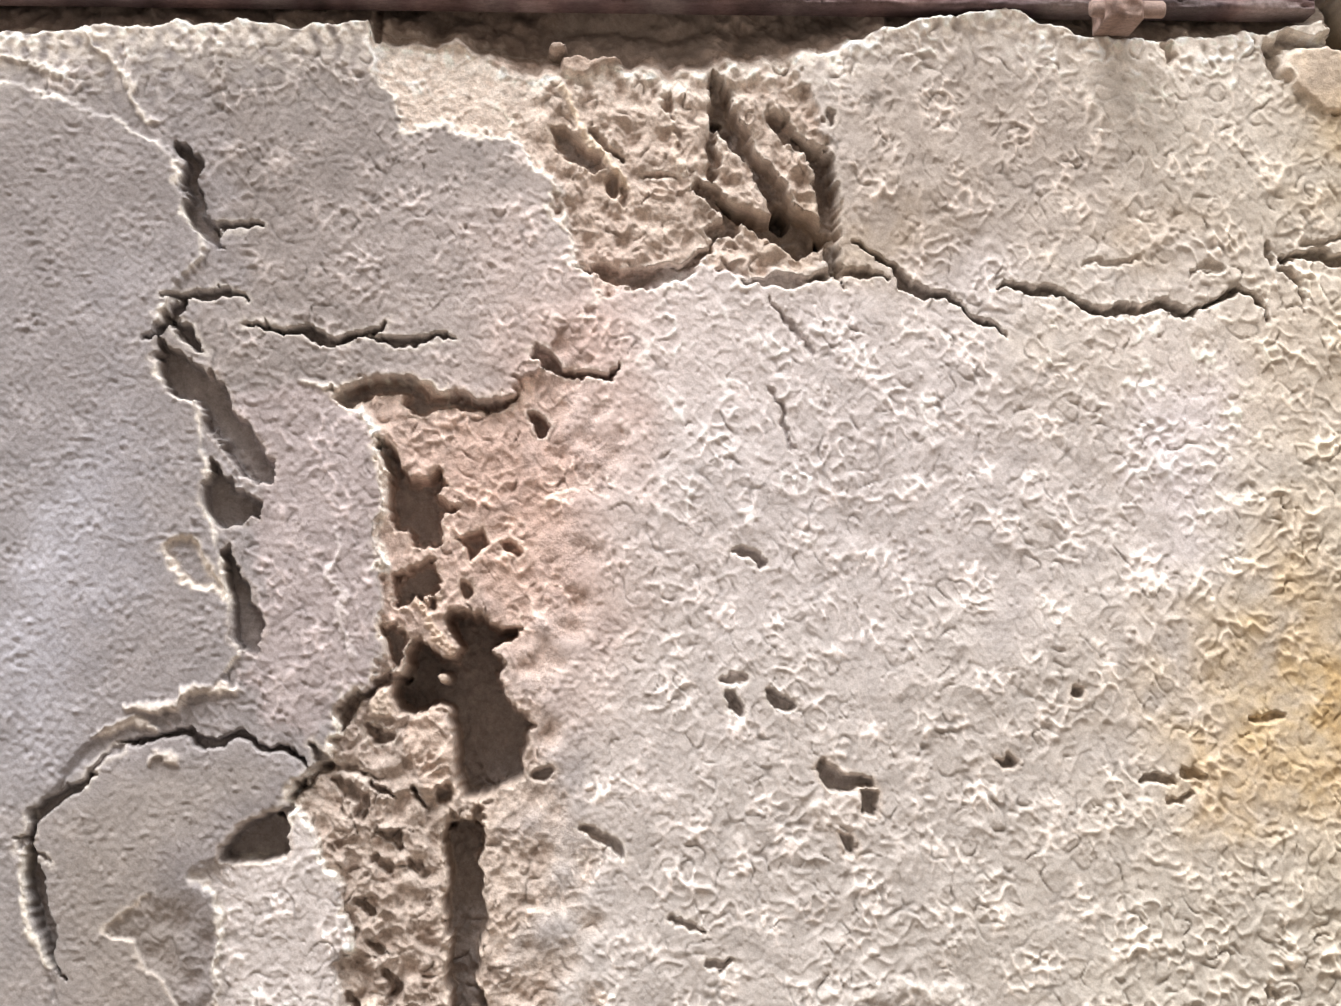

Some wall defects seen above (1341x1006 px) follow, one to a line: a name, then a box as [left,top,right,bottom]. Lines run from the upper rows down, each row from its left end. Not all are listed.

flaking render [368,28,831,299]
crack [574,68,1341,363]
crack [765,385,798,454]
flaking render [296,317,628,1006]
crack [11,726,309,982]
spalling [666,913,707,934]